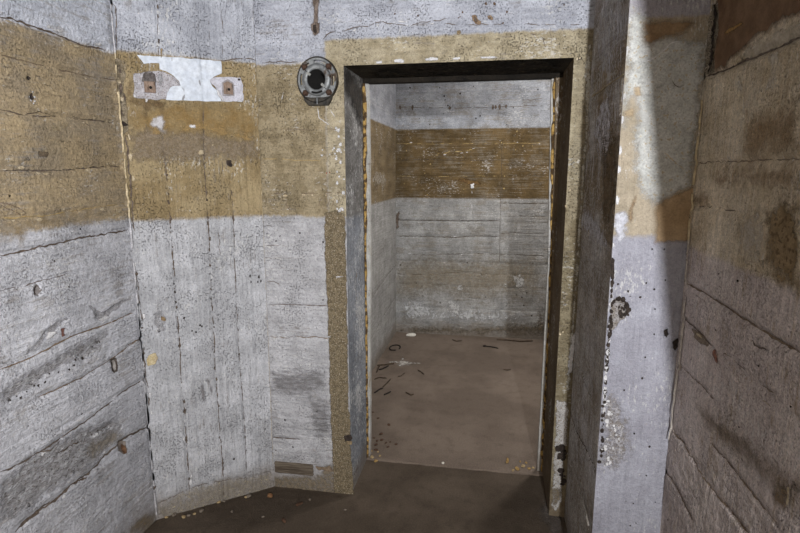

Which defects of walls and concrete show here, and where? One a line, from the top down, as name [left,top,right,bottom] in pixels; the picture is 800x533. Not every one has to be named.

peeling [115,48,244,133]
rust [311,0,320,36]
crack [706,37,800,79]
crack [0,109,135,256]
peeling [559,4,719,390]
leakage [766,202,799,288]
crack [1,272,153,532]
spalling [597,258,641,467]